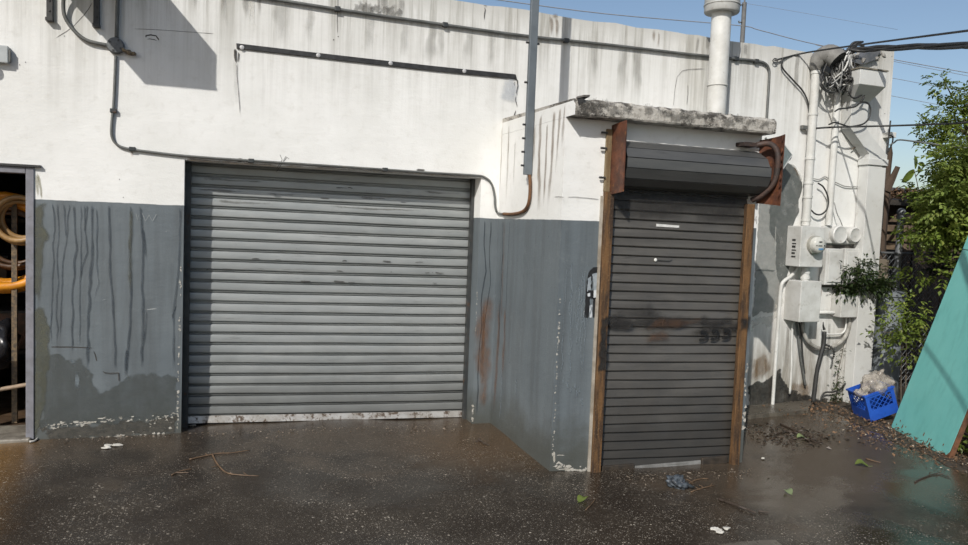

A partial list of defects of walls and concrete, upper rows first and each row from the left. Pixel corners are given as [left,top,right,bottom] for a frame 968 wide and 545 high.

water stain [40,206,177,429]
peeling [41,347,180,439]